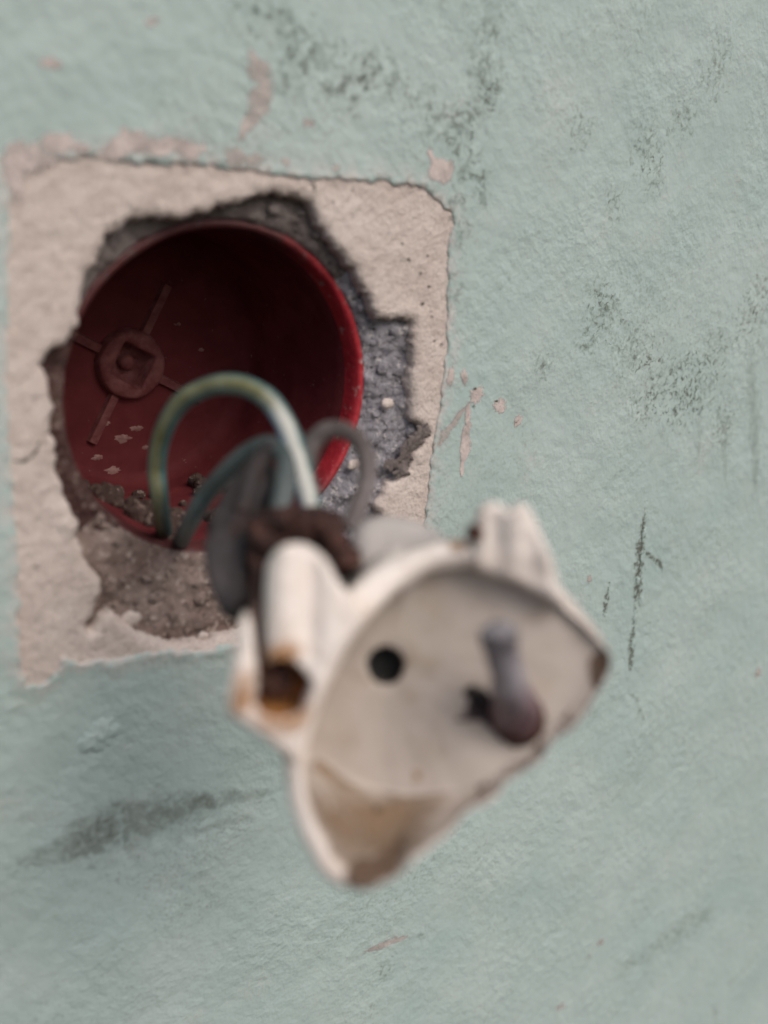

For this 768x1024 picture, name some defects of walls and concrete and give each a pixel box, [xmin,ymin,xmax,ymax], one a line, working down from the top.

peeling [0,127,207,206]
spalling [80,194,523,521]
spalling [39,322,253,640]
spalling [320,446,357,541]
crack [603,509,663,671]